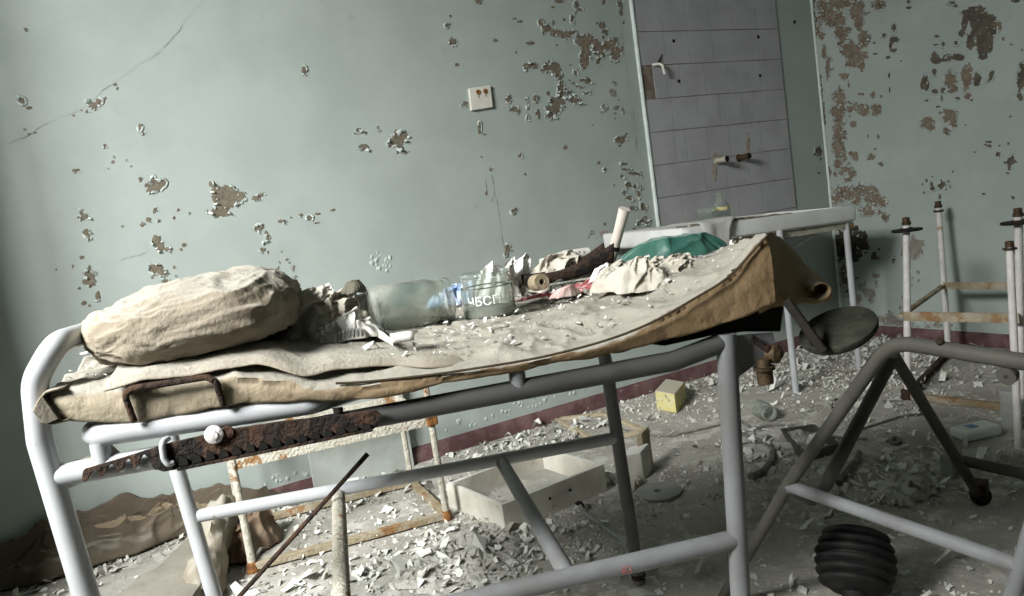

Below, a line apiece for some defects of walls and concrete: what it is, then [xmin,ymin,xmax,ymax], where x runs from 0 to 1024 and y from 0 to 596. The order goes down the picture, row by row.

peeling [72,83,119,117]
crack [6,3,201,145]
peeling [102,144,169,194]
peeling [205,180,265,218]
peeling [354,125,410,154]
peeling [505,0,624,122]
peeling [597,160,651,230]
peeling [812,0,902,223]
peeling [919,0,1024,136]
peeling [974,140,1017,174]
peeling [140,207,191,283]
peeling [72,256,101,308]